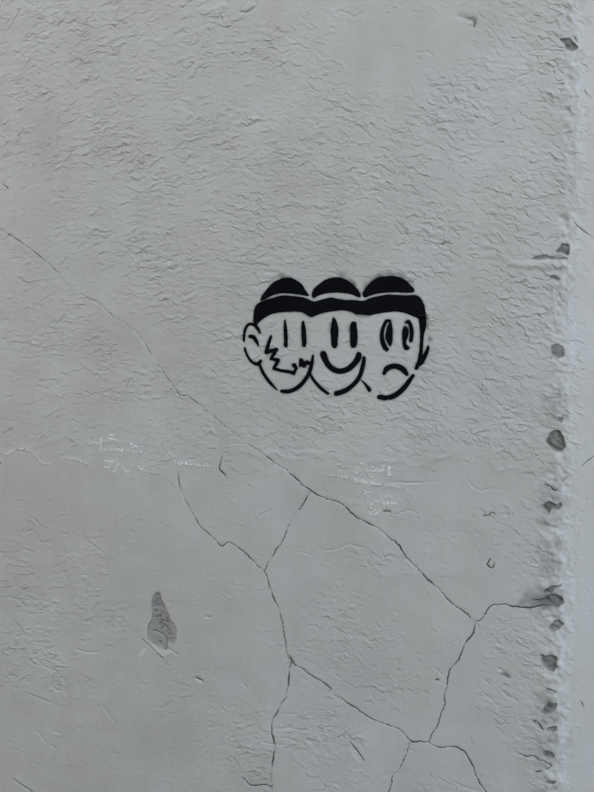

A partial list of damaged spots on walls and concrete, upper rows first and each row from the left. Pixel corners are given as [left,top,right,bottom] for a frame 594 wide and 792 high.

crack [0,229,60,274]
hole [546,417,566,452]
hole [542,501,562,514]
crack [81,294,552,792]
hole [532,584,564,607]
spalling [139,592,177,657]
hole [549,619,564,632]
hole [540,654,558,672]
hole [541,688,557,714]